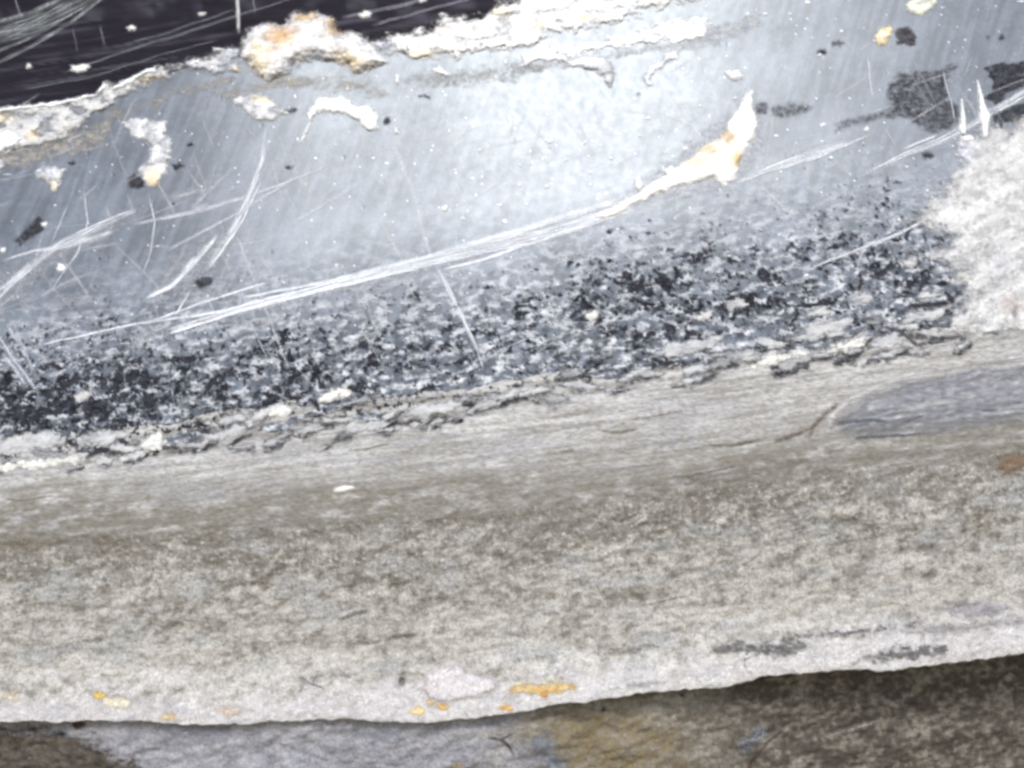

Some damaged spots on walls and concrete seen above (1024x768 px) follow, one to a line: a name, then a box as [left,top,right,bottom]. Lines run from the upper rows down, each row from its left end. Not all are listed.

peeling [187,48,239,74]
peeling [371,0,712,87]
peeling [0,65,173,169]
peeling [233,87,398,142]
leakage [0,212,127,297]
leakage [214,156,263,261]
leakage [49,201,627,343]
leakage [827,355,1024,448]